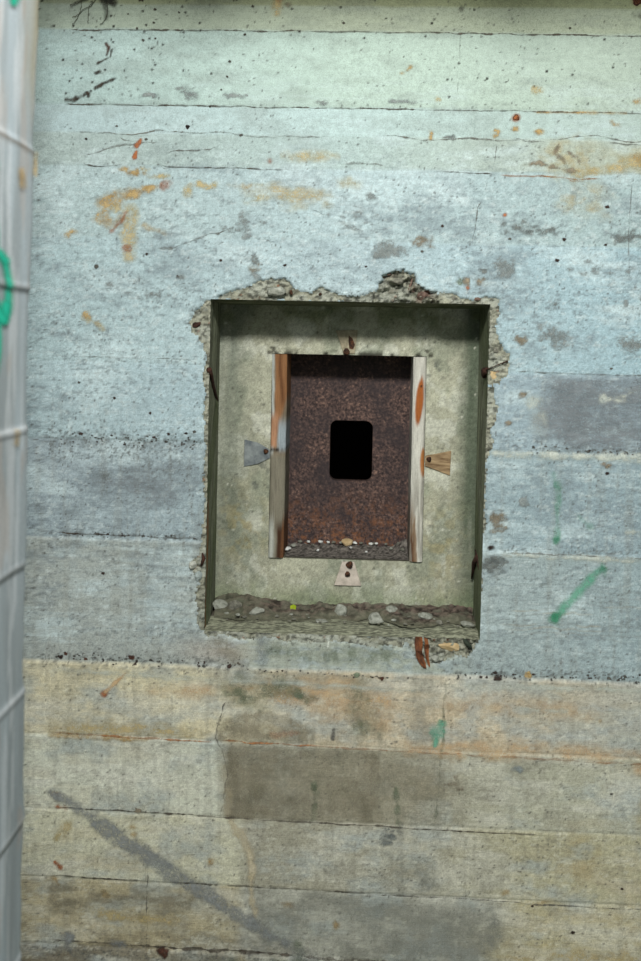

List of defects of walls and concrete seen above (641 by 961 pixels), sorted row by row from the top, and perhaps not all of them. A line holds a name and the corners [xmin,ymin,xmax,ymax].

rust [121,139,142,176]
rust [96,174,167,260]
spalling [61,255,514,630]
rust [414,637,430,668]